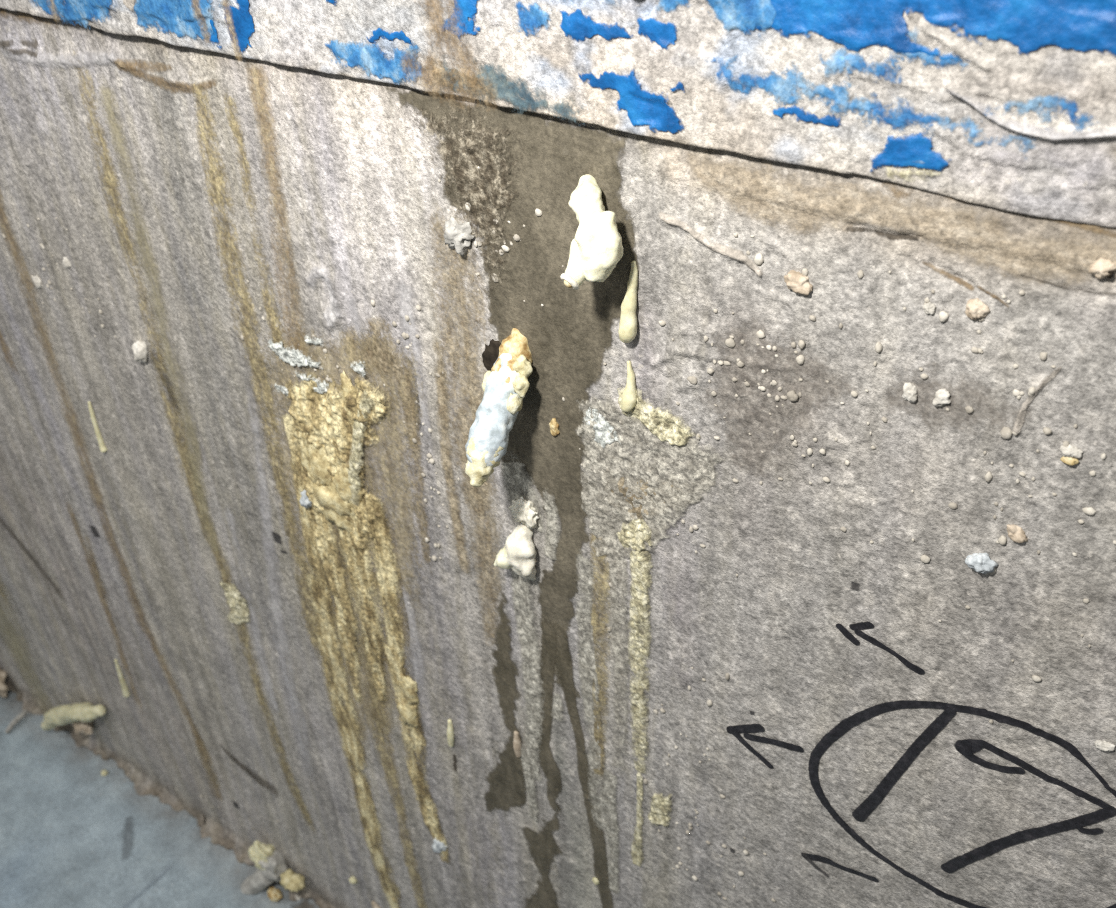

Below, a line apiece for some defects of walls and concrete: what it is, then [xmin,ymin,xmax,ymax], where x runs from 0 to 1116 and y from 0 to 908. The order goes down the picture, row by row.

peeling [33,0,112,28]
peeling [133,0,255,54]
peeling [443,0,480,37]
peeling [516,0,688,49]
peeling [325,28,422,84]
peeling [438,62,576,122]
peeling [578,70,684,134]
peeling [690,0,1116,282]
leakage [345,88,638,908]